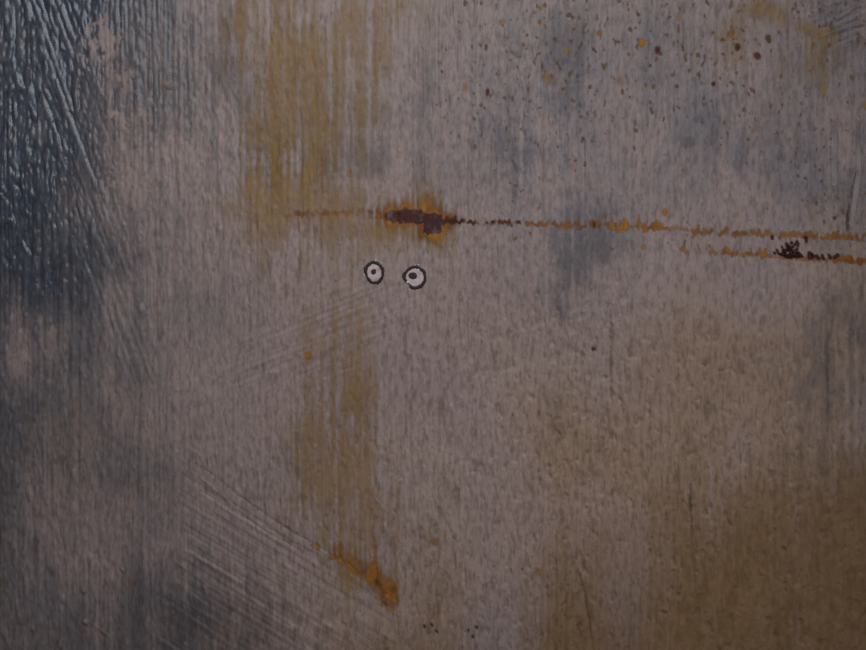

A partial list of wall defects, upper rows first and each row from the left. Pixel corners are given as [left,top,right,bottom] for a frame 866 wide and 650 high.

corrosion [369,197,668,242]
corrosion [709,231,863,265]
corrosion [330,546,398,608]